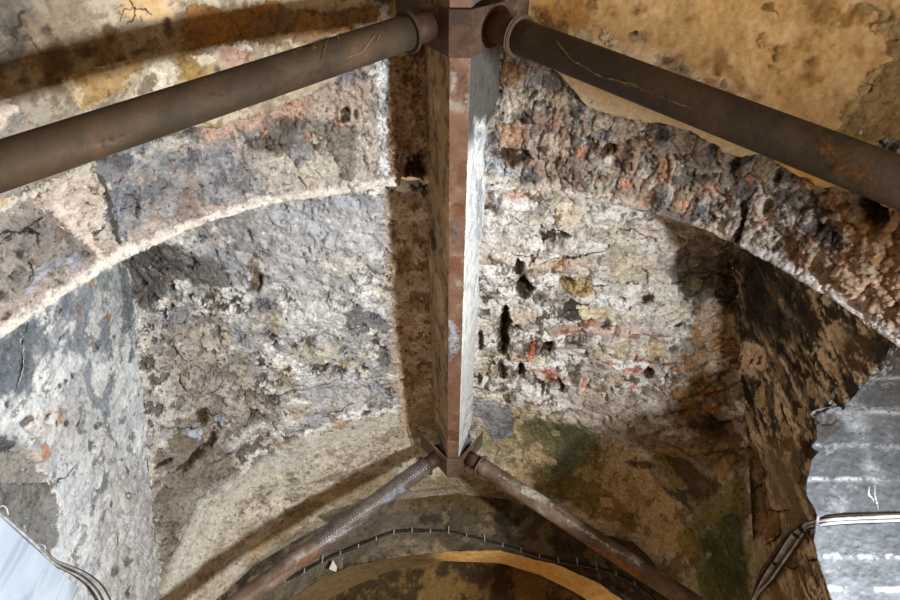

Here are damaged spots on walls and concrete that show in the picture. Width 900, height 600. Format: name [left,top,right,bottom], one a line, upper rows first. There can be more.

crack [120,0,148,24]
peeling [0,161,112,270]
spalling [203,97,358,194]
spalling [515,258,535,300]
spalling [528,130,633,243]
spalling [552,133,744,378]
crack [732,187,759,244]
spalling [497,305,512,379]
leakage [710,227,900,445]
leakage [672,386,726,438]
leakage [518,421,608,503]
leakage [799,438,811,483]